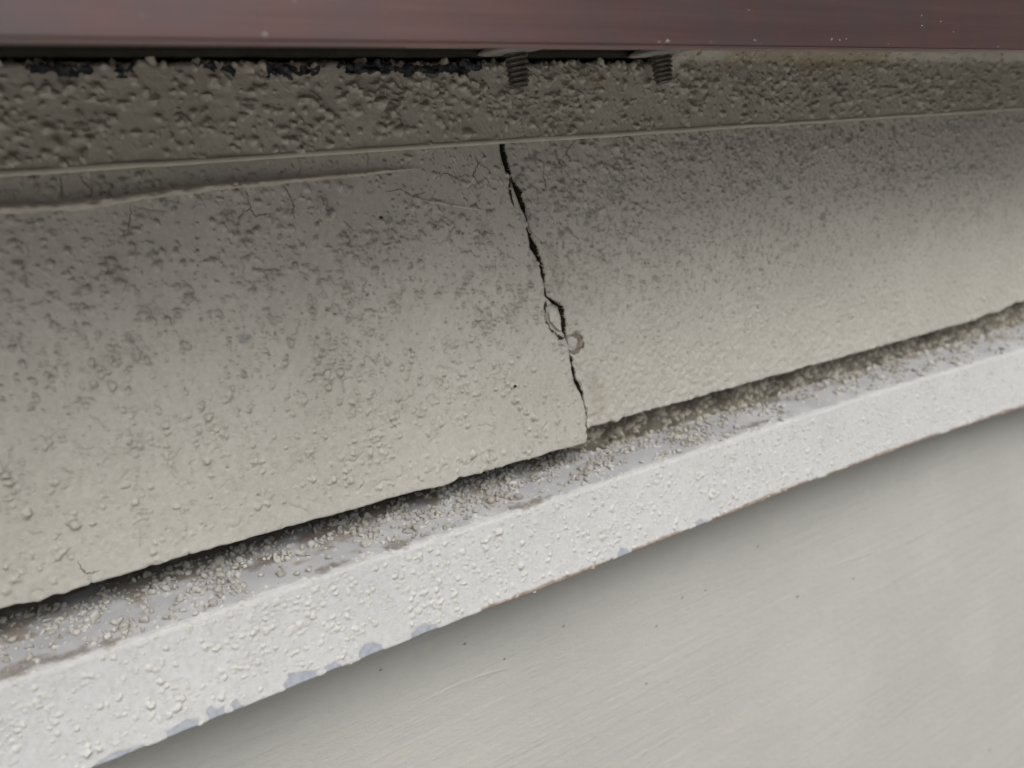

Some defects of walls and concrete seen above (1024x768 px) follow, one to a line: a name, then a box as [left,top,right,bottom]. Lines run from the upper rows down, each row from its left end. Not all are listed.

crack [385,141,588,433]